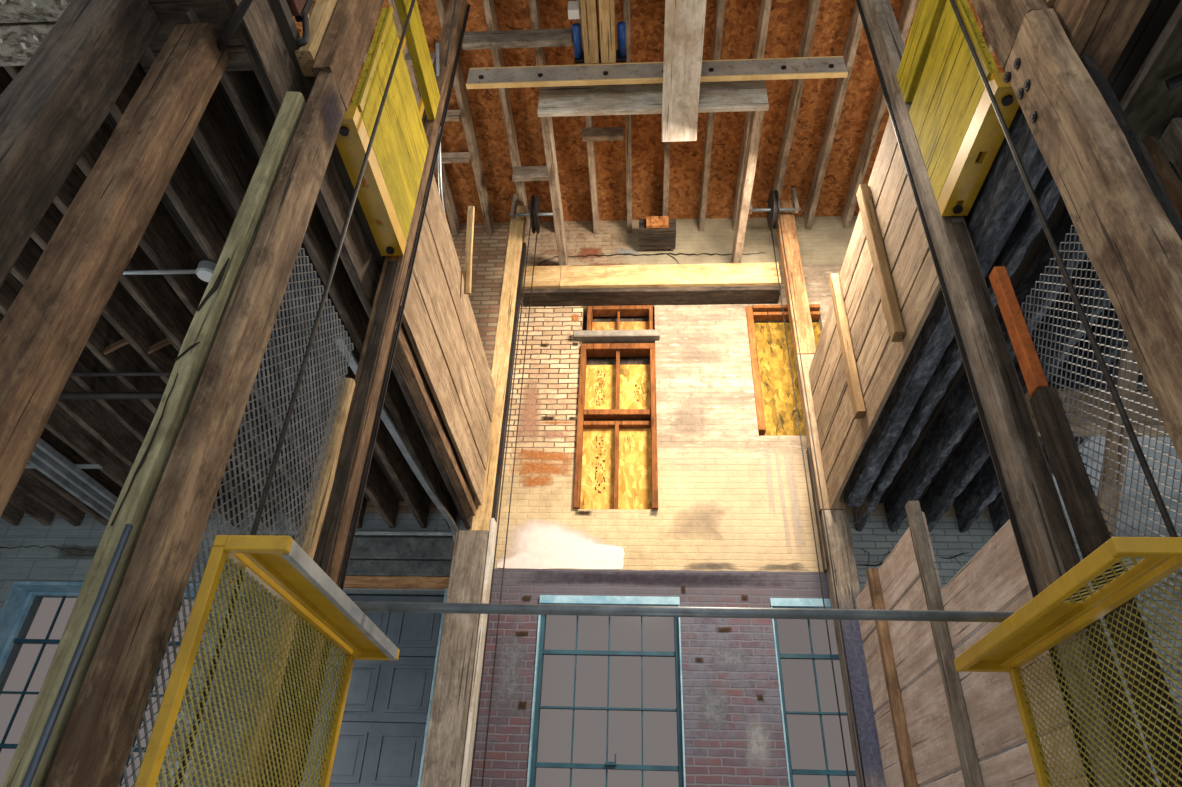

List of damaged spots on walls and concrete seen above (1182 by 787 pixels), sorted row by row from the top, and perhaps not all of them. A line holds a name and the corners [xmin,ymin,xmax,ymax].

crack [196,258,230,311]
crack [111,342,200,526]
peeling [520,389,575,438]
crack [0,545,91,558]